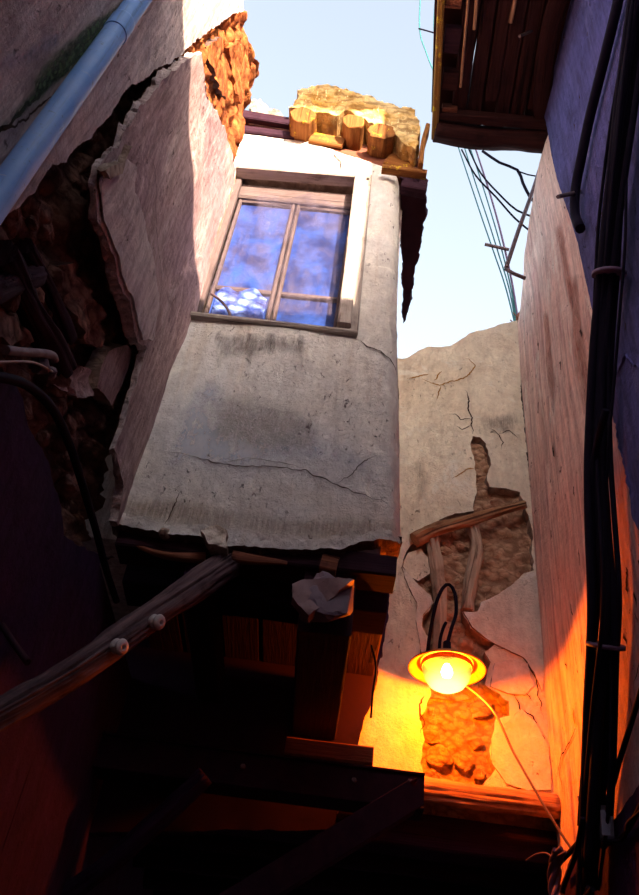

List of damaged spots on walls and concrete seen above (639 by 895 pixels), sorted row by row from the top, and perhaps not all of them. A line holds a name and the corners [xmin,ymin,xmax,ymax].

crack [0,58,79,132]
leakage [35,11,114,93]
spalling [0,11,260,546]
crack [361,341,531,488]
crack [161,450,397,513]
peeling [613,416,639,530]
spalling [112,443,552,791]